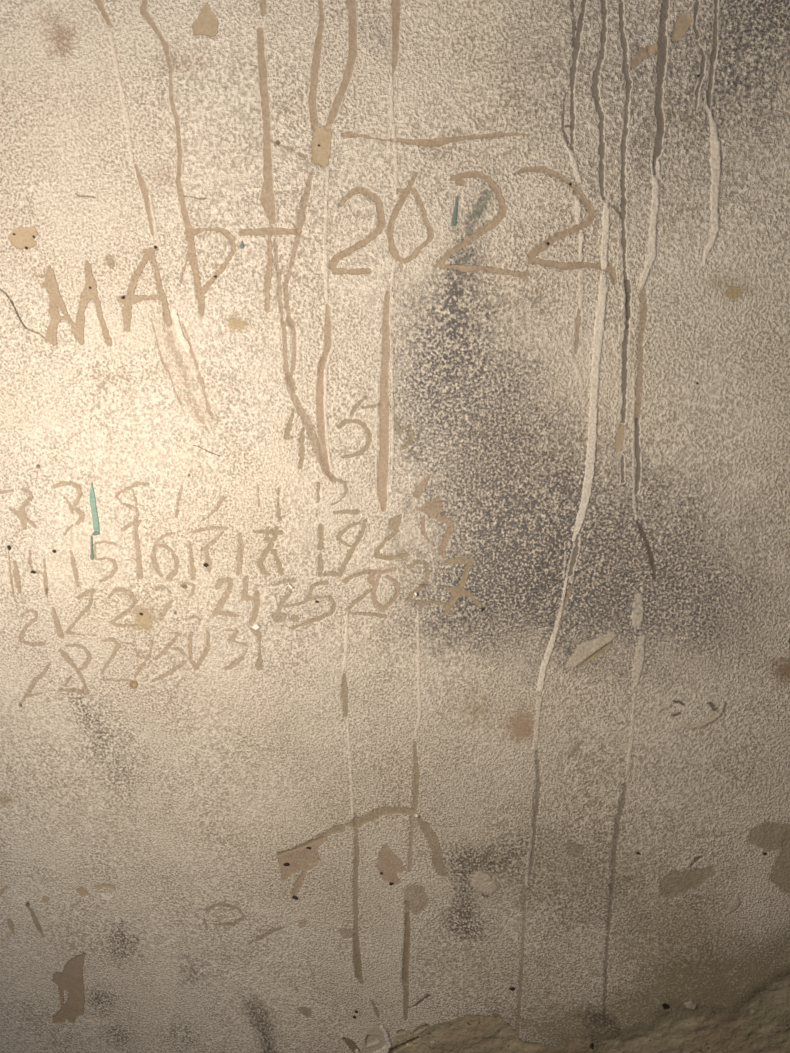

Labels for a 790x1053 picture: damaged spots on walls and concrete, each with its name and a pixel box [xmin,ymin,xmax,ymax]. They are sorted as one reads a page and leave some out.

peeling [192,2,218,38]
peeling [9,226,37,249]
crack [0,289,45,338]
water stain [375,0,756,1036]
peeling [278,837,327,900]
peeling [376,844,428,914]
flaking render [661,866,715,898]
flaking render [749,823,790,893]
peeling [25,902,44,938]
peeling [202,902,245,930]
peeling [52,953,85,1024]
flaking render [389,939,790,1053]